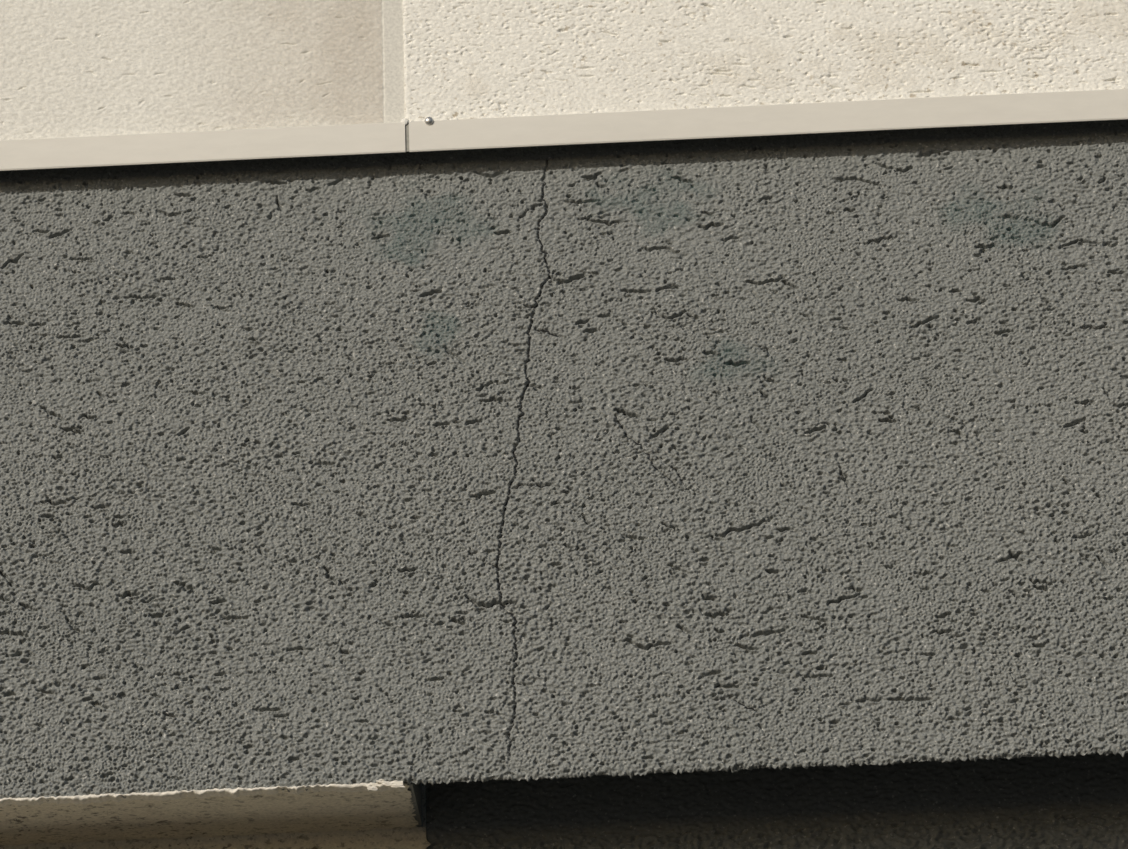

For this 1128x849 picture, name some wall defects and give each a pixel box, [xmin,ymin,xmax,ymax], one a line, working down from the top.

crack [468,160,563,759]